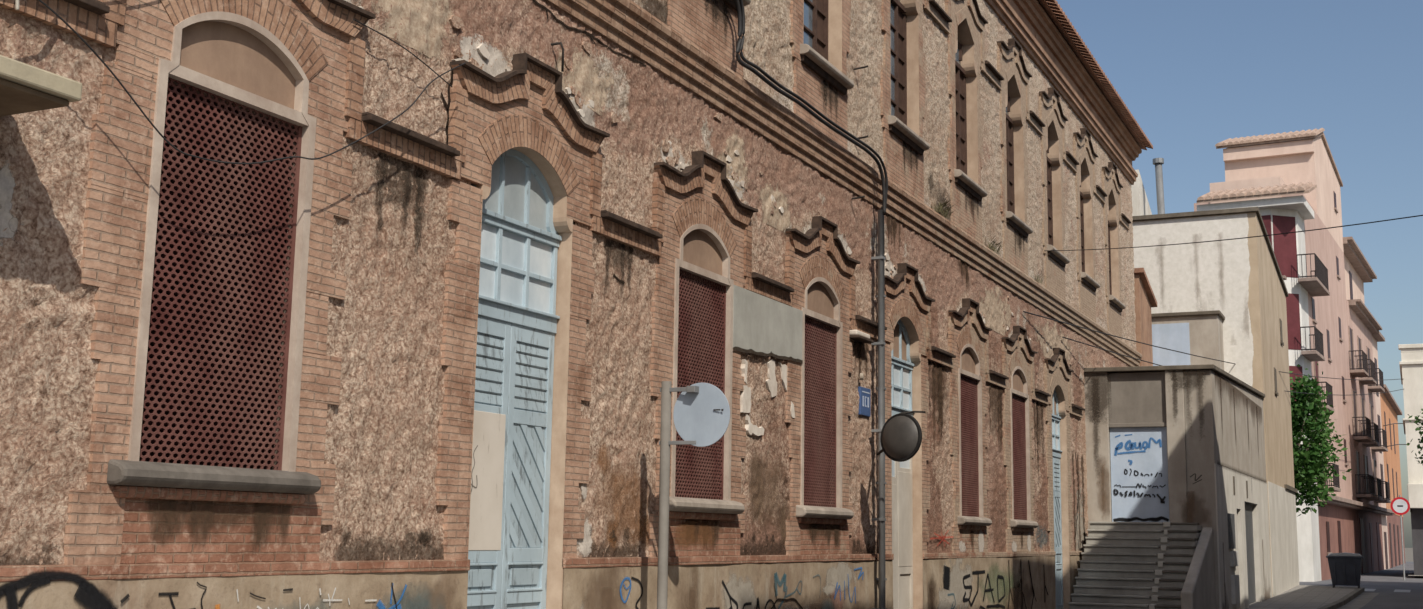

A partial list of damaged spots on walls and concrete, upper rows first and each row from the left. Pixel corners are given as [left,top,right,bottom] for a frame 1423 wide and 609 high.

peeling [345,0,511,77]
spalling [0,163,18,246]
damp [375,154,426,236]
peeling [740,359,795,436]
damp [150,501,290,541]